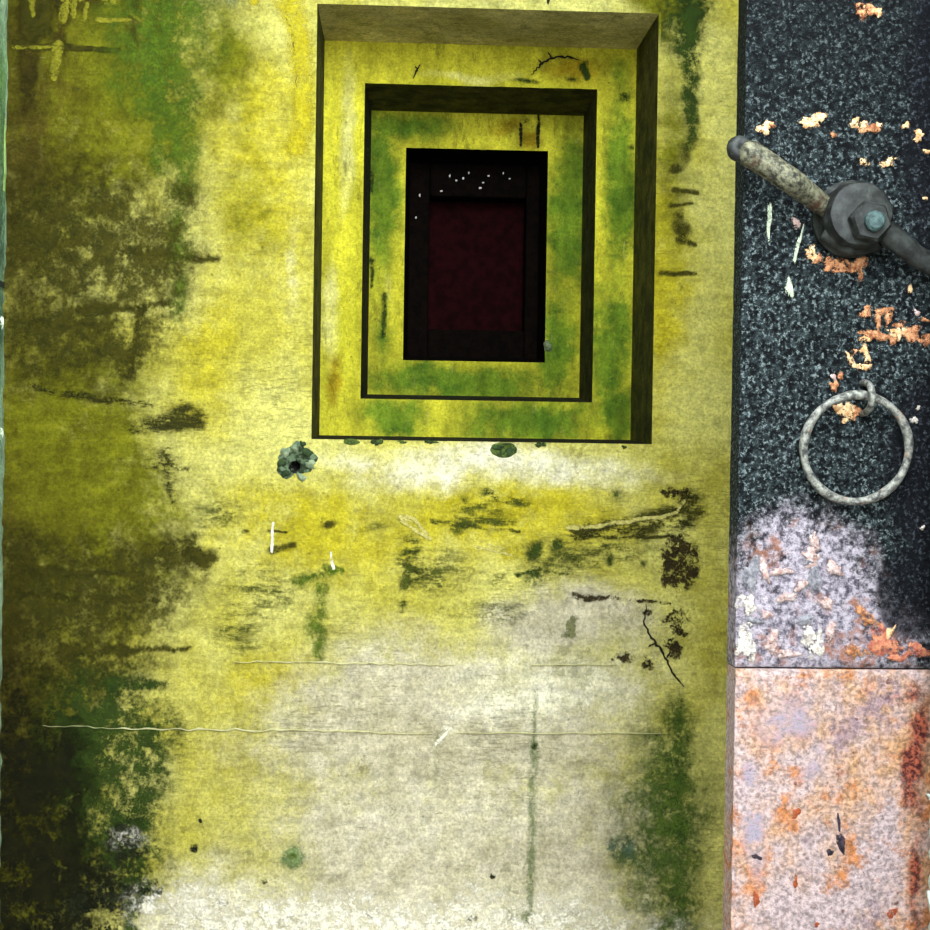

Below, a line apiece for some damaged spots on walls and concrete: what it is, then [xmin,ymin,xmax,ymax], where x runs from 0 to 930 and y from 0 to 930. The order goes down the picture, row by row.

peeling [856,3,883,20]
crack [531,52,579,75]
peeling [799,112,827,129]
peeling [849,117,882,133]
peeling [902,121,930,154]
leakage [3,118,219,434]
leakage [431,488,530,534]
peeling [735,531,844,662]
leakage [572,592,691,660]
leakage [611,651,657,670]
crack [643,606,684,686]
leakage [0,527,634,930]